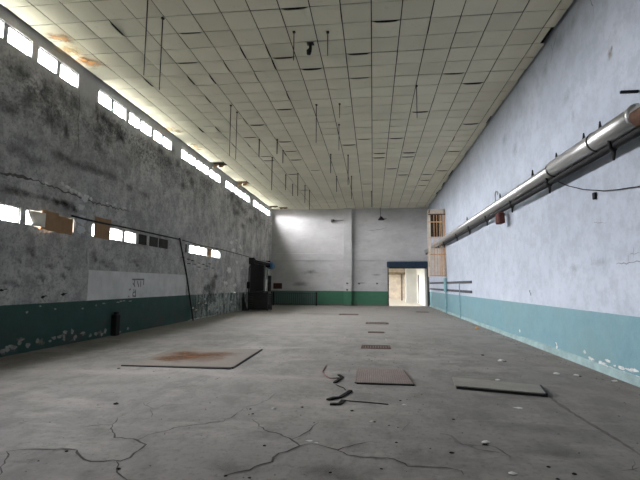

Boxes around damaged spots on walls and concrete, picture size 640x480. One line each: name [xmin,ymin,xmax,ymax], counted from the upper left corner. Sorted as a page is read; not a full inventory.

crack [0,172,130,212]
peeling [0,328,107,356]
peeling [583,350,640,377]
crack [0,391,464,480]